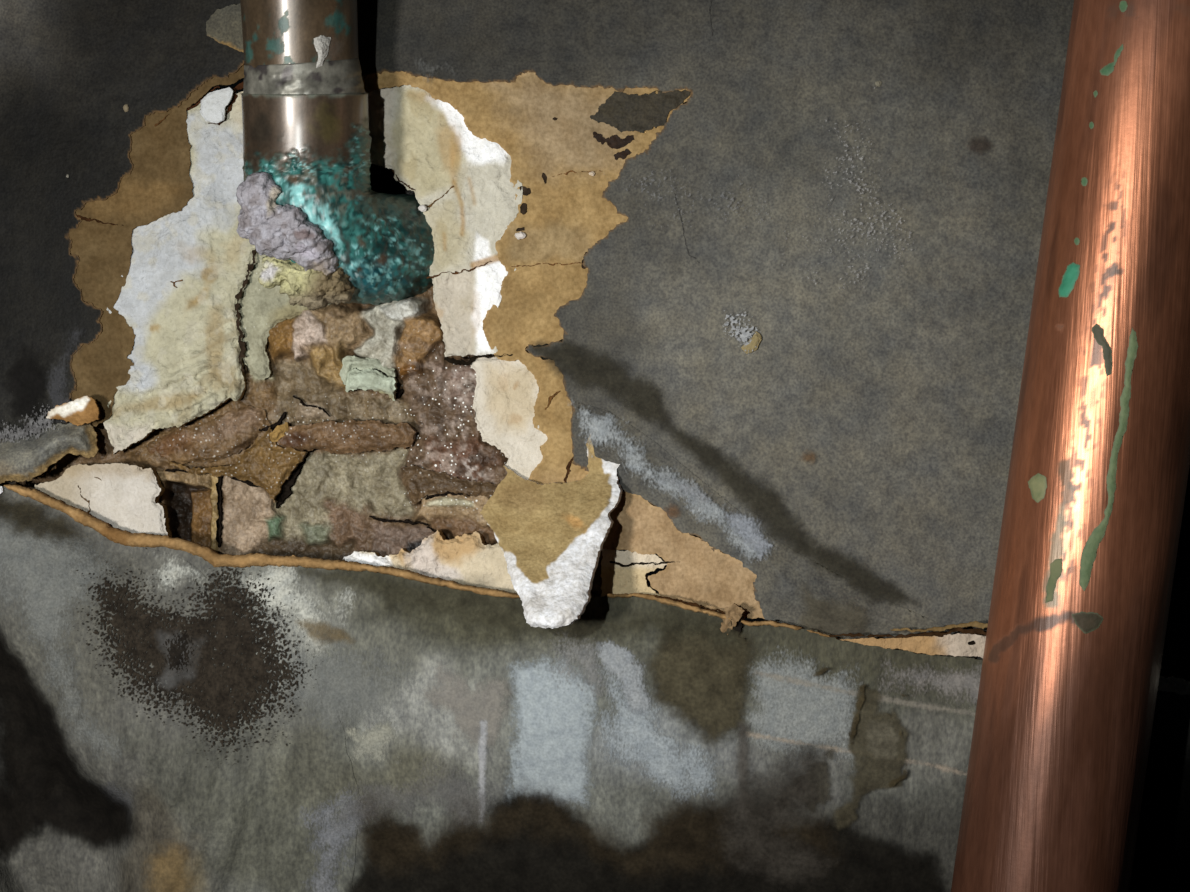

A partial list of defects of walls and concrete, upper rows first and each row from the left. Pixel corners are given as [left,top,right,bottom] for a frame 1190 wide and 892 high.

flaking render [0,82,667,629]
damp [534,343,905,603]
damp [0,499,541,856]
damp [300,608,944,892]
crack [829,621,988,638]
damp [886,663,981,703]